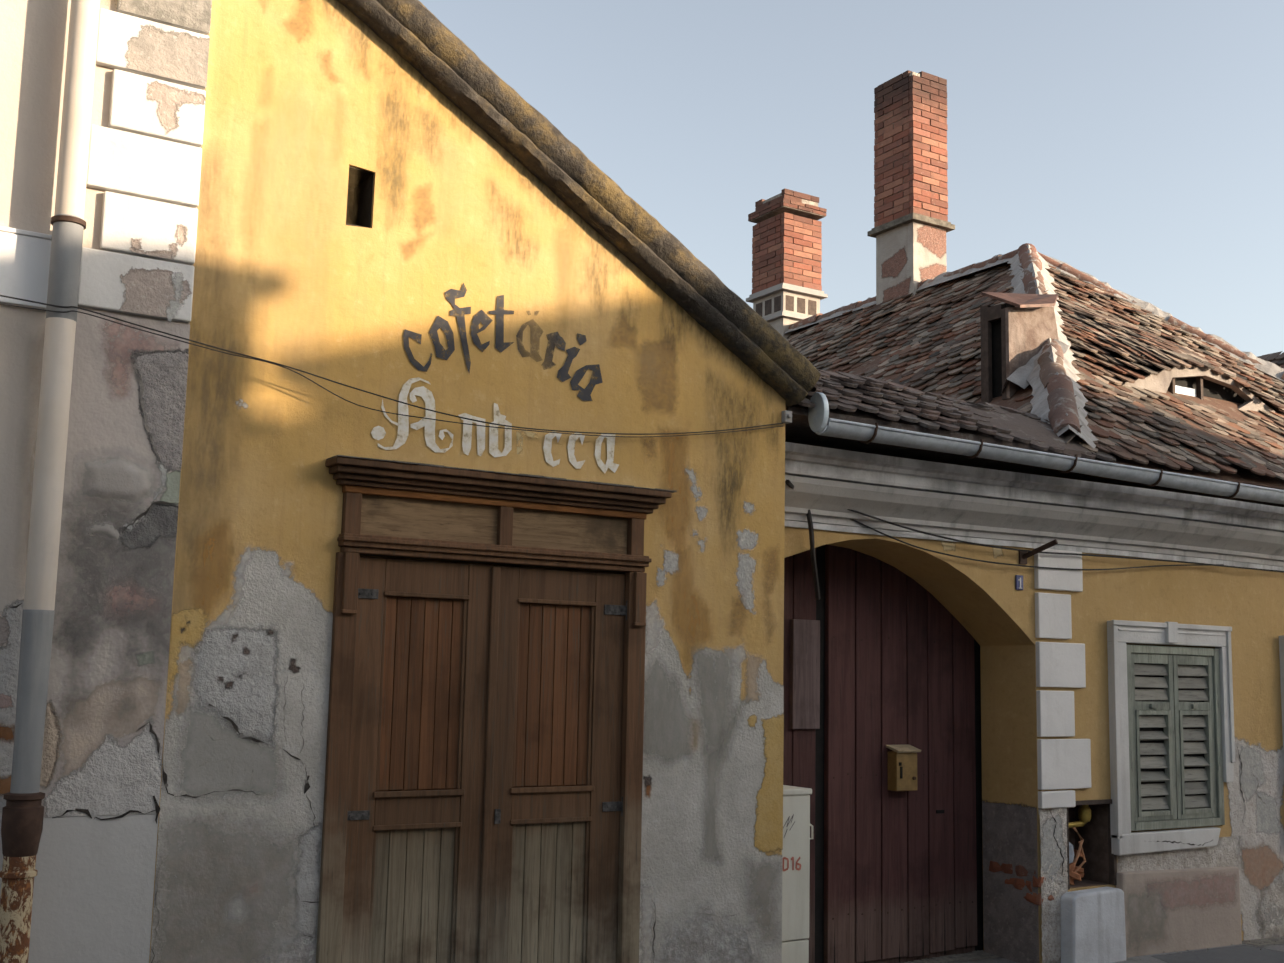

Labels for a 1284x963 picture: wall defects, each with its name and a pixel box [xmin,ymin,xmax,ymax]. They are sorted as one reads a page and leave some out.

peeling [125,24,210,133]
peeling [119,224,191,321]
flaking render [119,349,189,549]
peeling [656,550,679,586]
peeling [686,468,708,552]
peeling [736,529,758,614]
flaking render [0,600,24,819]
crack [52,764,261,824]
flaking render [40,547,333,963]
crack [209,676,316,827]
flaking render [639,602,784,963]
flaking render [1117,737,1284,941]